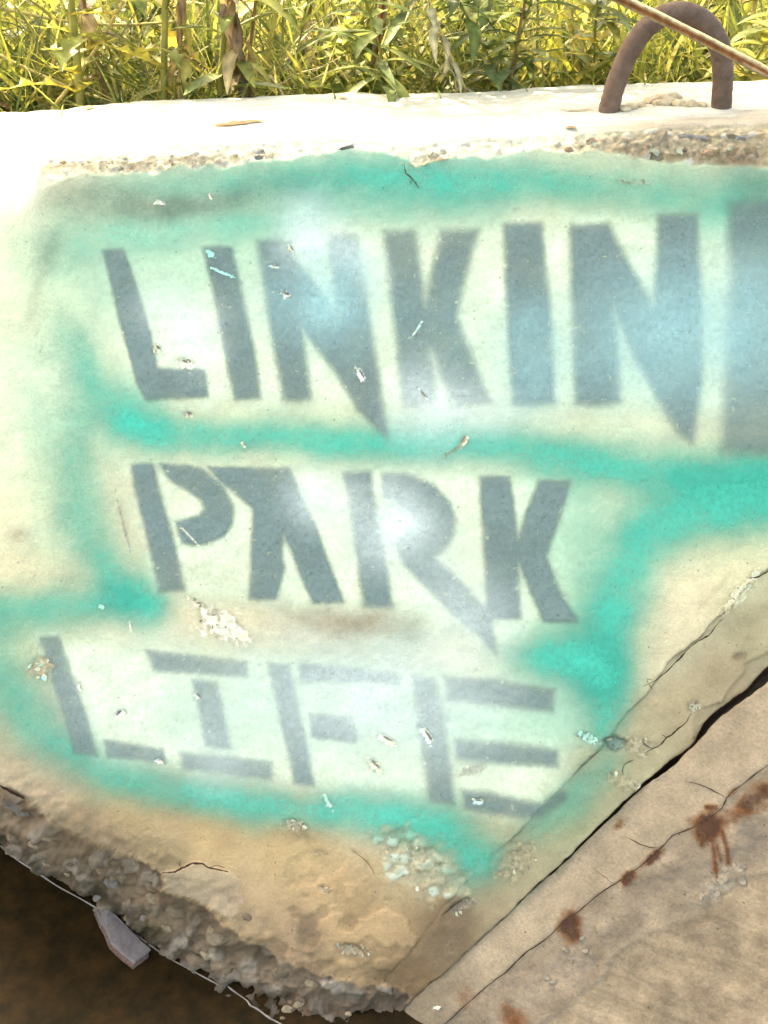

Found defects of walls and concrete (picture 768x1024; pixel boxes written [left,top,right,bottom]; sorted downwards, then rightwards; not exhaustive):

spalling [36,148,284,173]
spalling [410,152,453,167]
peeling [187,595,252,647]
crack [644,618,723,688]
crack [622,714,691,773]
corrosion [693,783,768,879]
crack [160,861,228,875]
spalling [123,882,187,932]
spalling [186,925,229,968]
corrosion [557,910,581,943]
crack [445,765,768,1024]
spalling [271,968,315,1020]